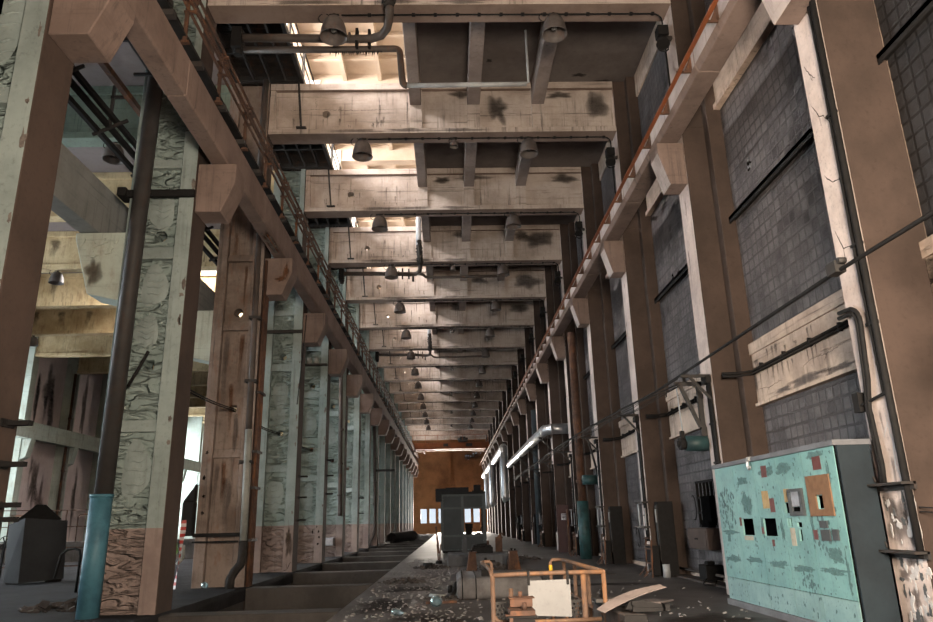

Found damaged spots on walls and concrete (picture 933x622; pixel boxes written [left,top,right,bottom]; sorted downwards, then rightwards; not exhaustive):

damp [33,370,53,426]
damp [80,386,88,434]
damp [779,361,855,392]
damp [28,460,42,506]
damp [69,475,77,529]
peeling [885,490,933,622]